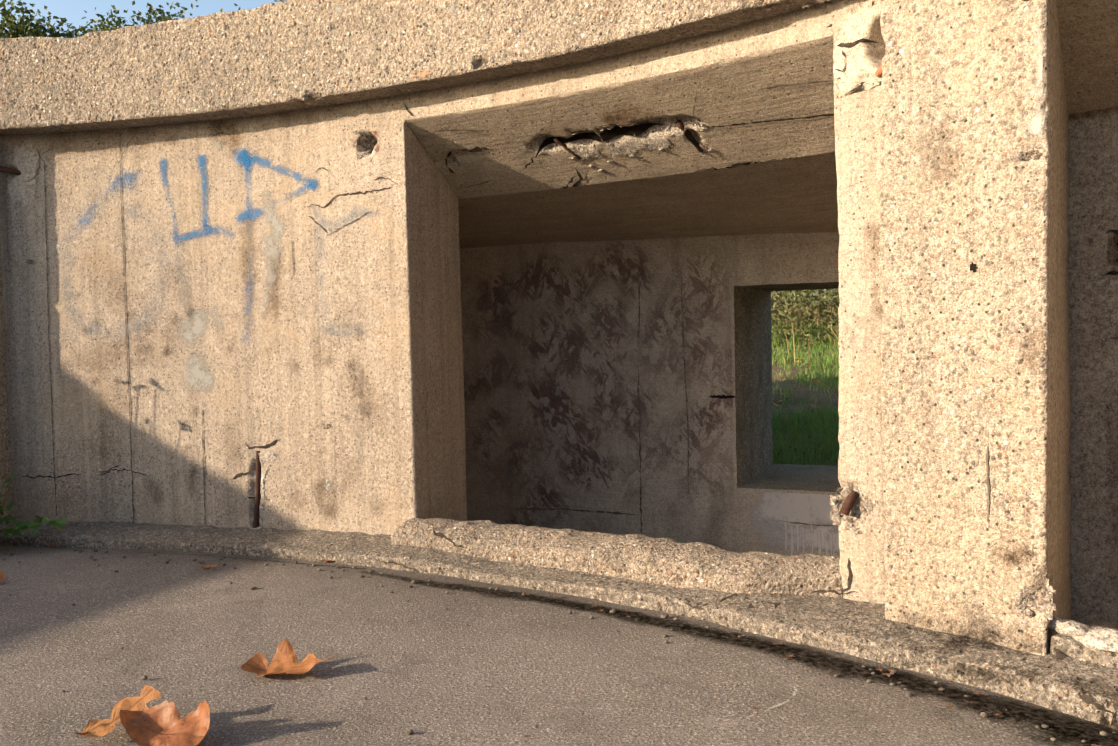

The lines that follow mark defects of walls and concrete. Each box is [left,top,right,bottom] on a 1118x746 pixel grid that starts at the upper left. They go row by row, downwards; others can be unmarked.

crack [759,38,879,92]
flaking render [797,0,886,95]
crack [436,129,495,189]
crack [525,93,834,188]
crack [302,167,397,233]